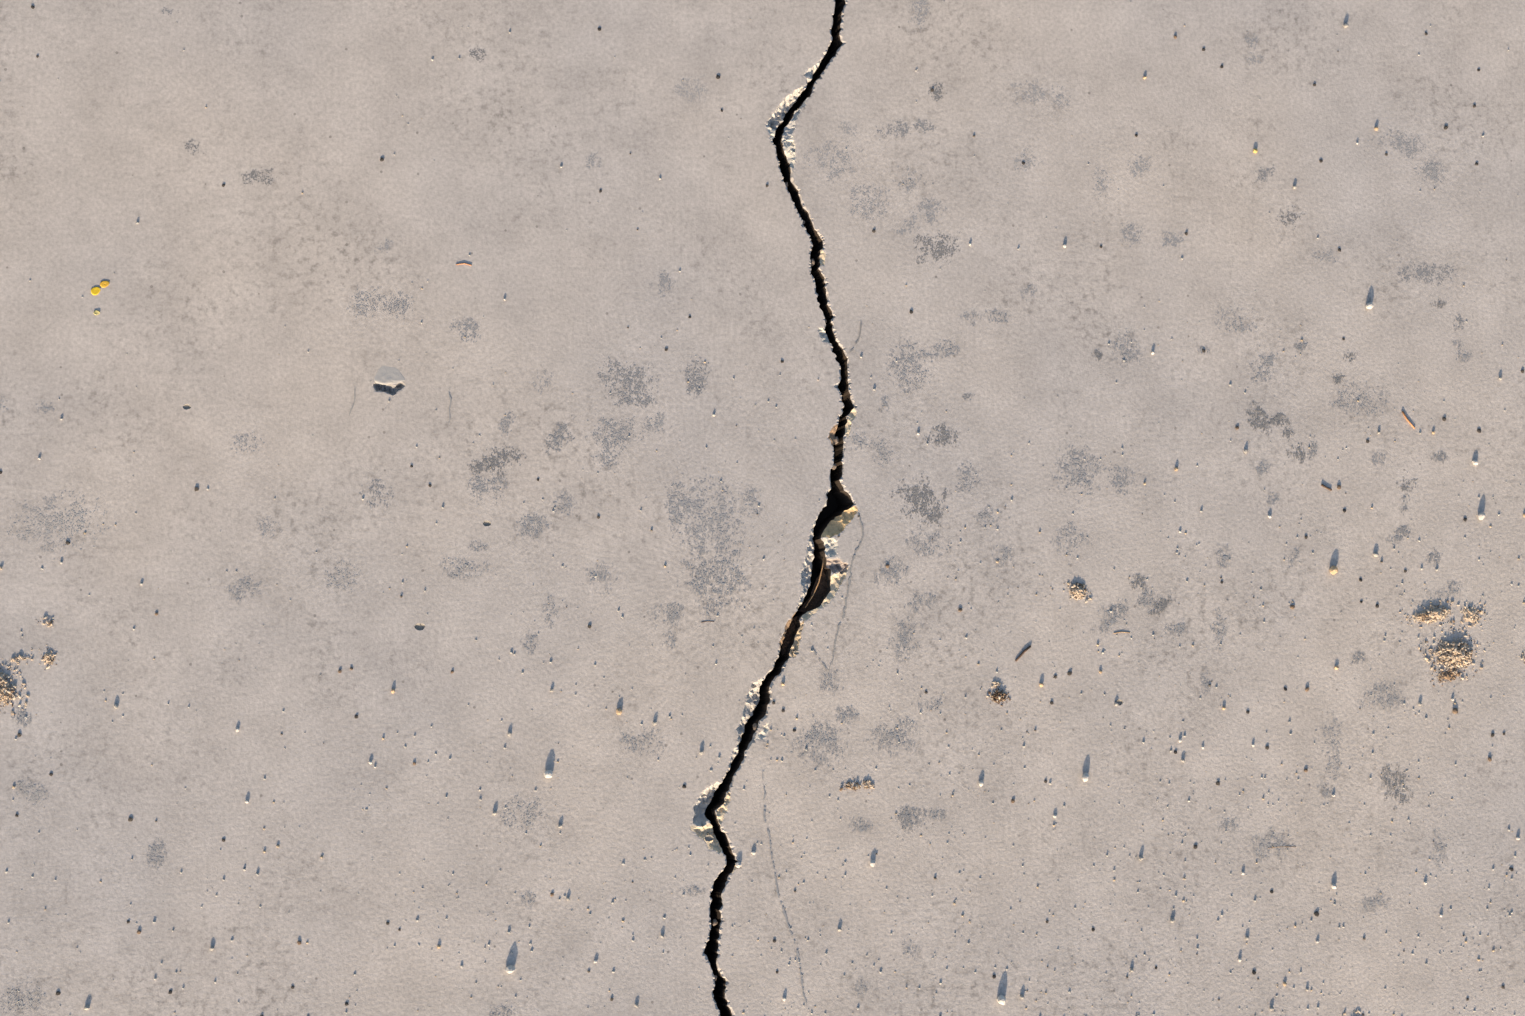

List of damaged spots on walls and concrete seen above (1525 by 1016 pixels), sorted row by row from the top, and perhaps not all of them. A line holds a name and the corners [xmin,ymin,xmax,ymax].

crack [704,0,864,1016]